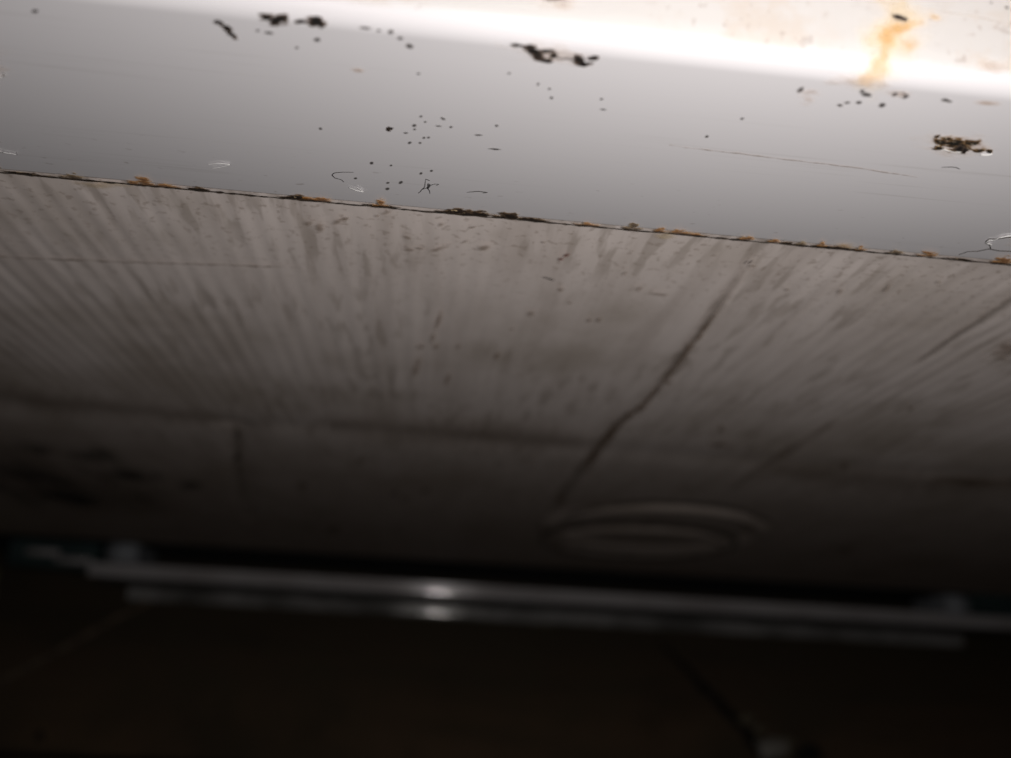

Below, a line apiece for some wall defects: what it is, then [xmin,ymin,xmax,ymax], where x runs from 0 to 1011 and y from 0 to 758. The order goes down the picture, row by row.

corrosion [883,14,908,41]